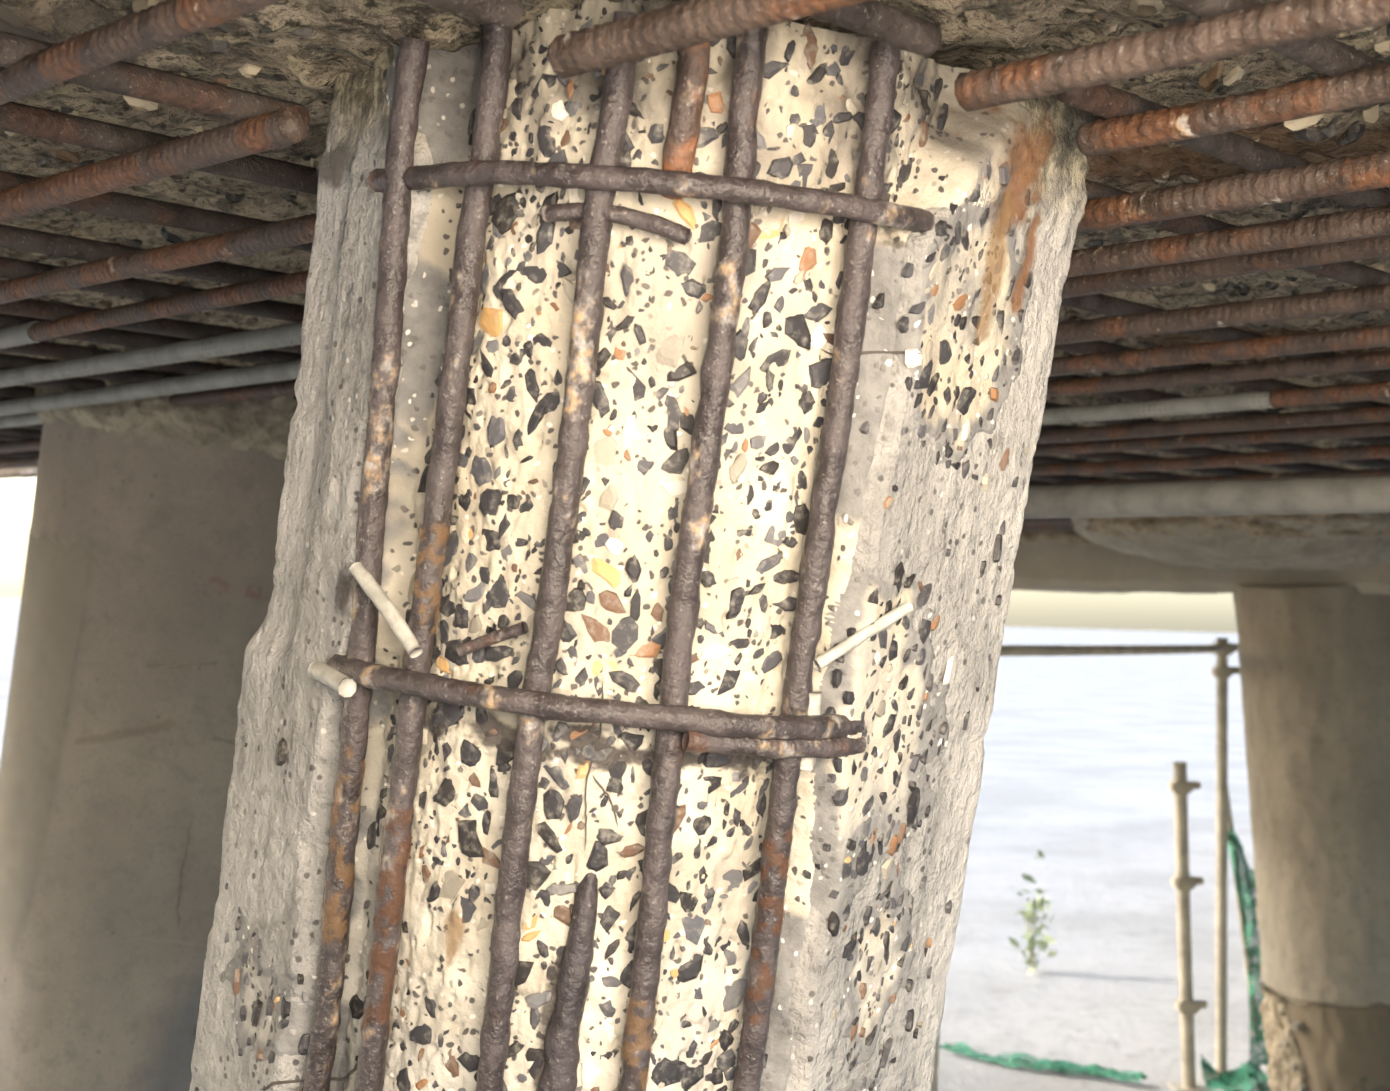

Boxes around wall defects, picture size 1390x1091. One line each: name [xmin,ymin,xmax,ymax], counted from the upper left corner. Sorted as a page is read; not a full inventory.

spalling [132,0,158,12]
spalling [1074,8,1118,36]
spalling [1129,0,1201,28]
spalling [1336,23,1390,56]
spalling [213,63,261,85]
spalling [1199,61,1245,92]
spalling [123,95,158,112]
spalling [1250,104,1379,156]
spalling [199,188,311,222]
spalling [1262,202,1309,223]
spalling [1179,276,1299,308]
spalling [1020,531,1099,547]